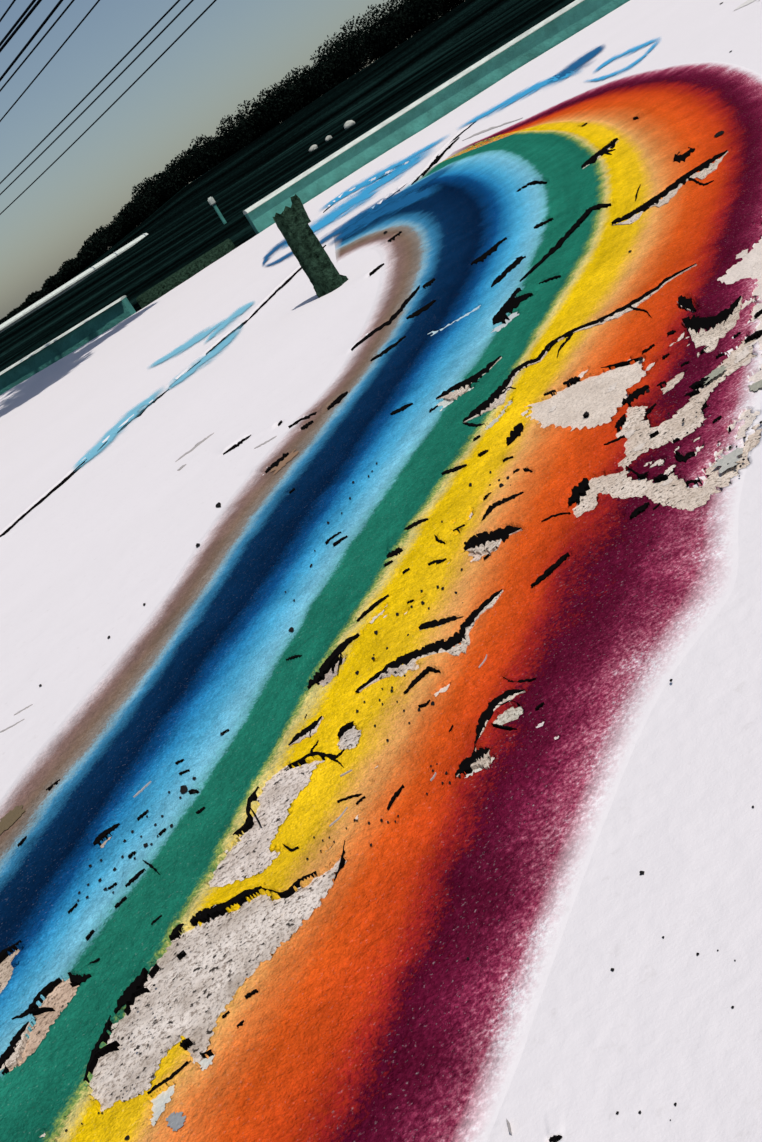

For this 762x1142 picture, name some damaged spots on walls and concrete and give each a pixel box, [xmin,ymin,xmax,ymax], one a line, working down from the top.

spalling [612,151,728,226]
crack [369,231,402,276]
crack [471,147,728,325]
peeling [521,235,762,517]
spalling [448,529,523,570]
crack [83,263,762,1083]
peeling [430,690,525,784]
peeling [209,760,325,887]
peeling [0,949,20,993]
peeling [0,978,79,1072]
crack [147,1038,214,1095]
peeling [89,858,347,1126]